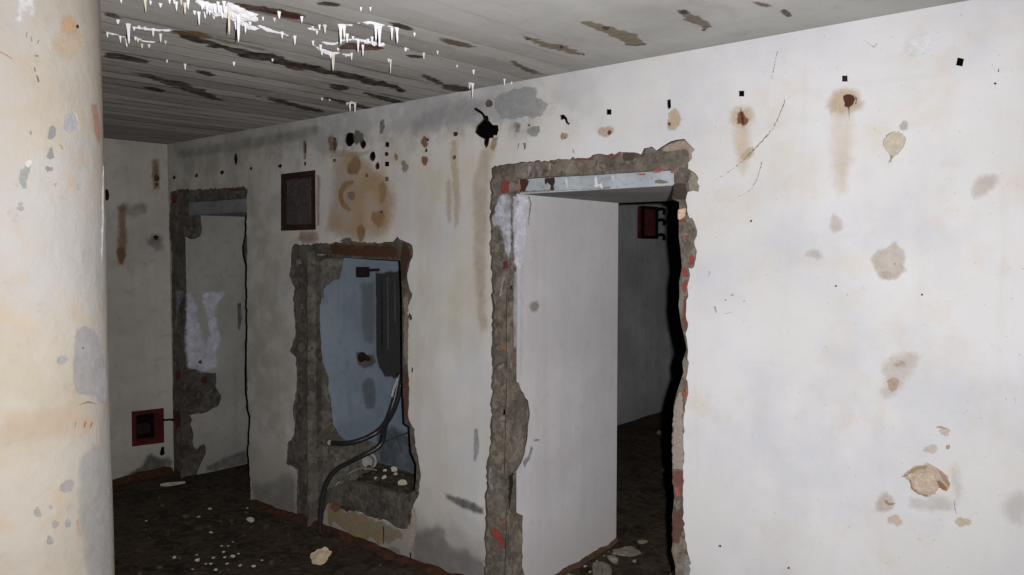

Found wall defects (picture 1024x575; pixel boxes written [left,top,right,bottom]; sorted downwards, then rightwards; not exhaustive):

damp [106,20,171,48]
damp [144,0,296,44]
damp [300,7,410,70]
peeling [476,87,570,149]
rust [737,108,748,125]
crack [727,100,785,186]
rust [833,92,857,110]
spalling [160,174,248,478]
spalling [485,139,699,575]
spalling [288,238,421,555]
peeling [902,426,950,497]